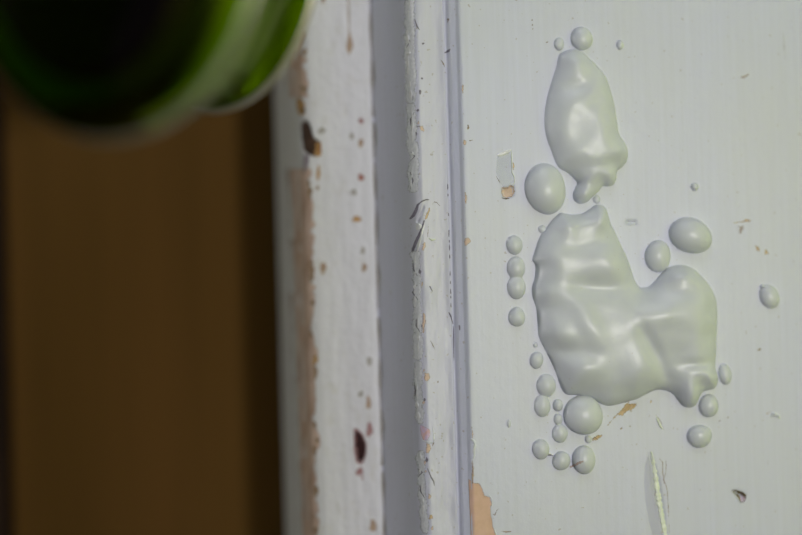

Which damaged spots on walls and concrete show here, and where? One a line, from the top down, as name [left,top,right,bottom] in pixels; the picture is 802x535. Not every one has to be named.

peeling [497,149,515,199]
peeling [469,430,497,535]